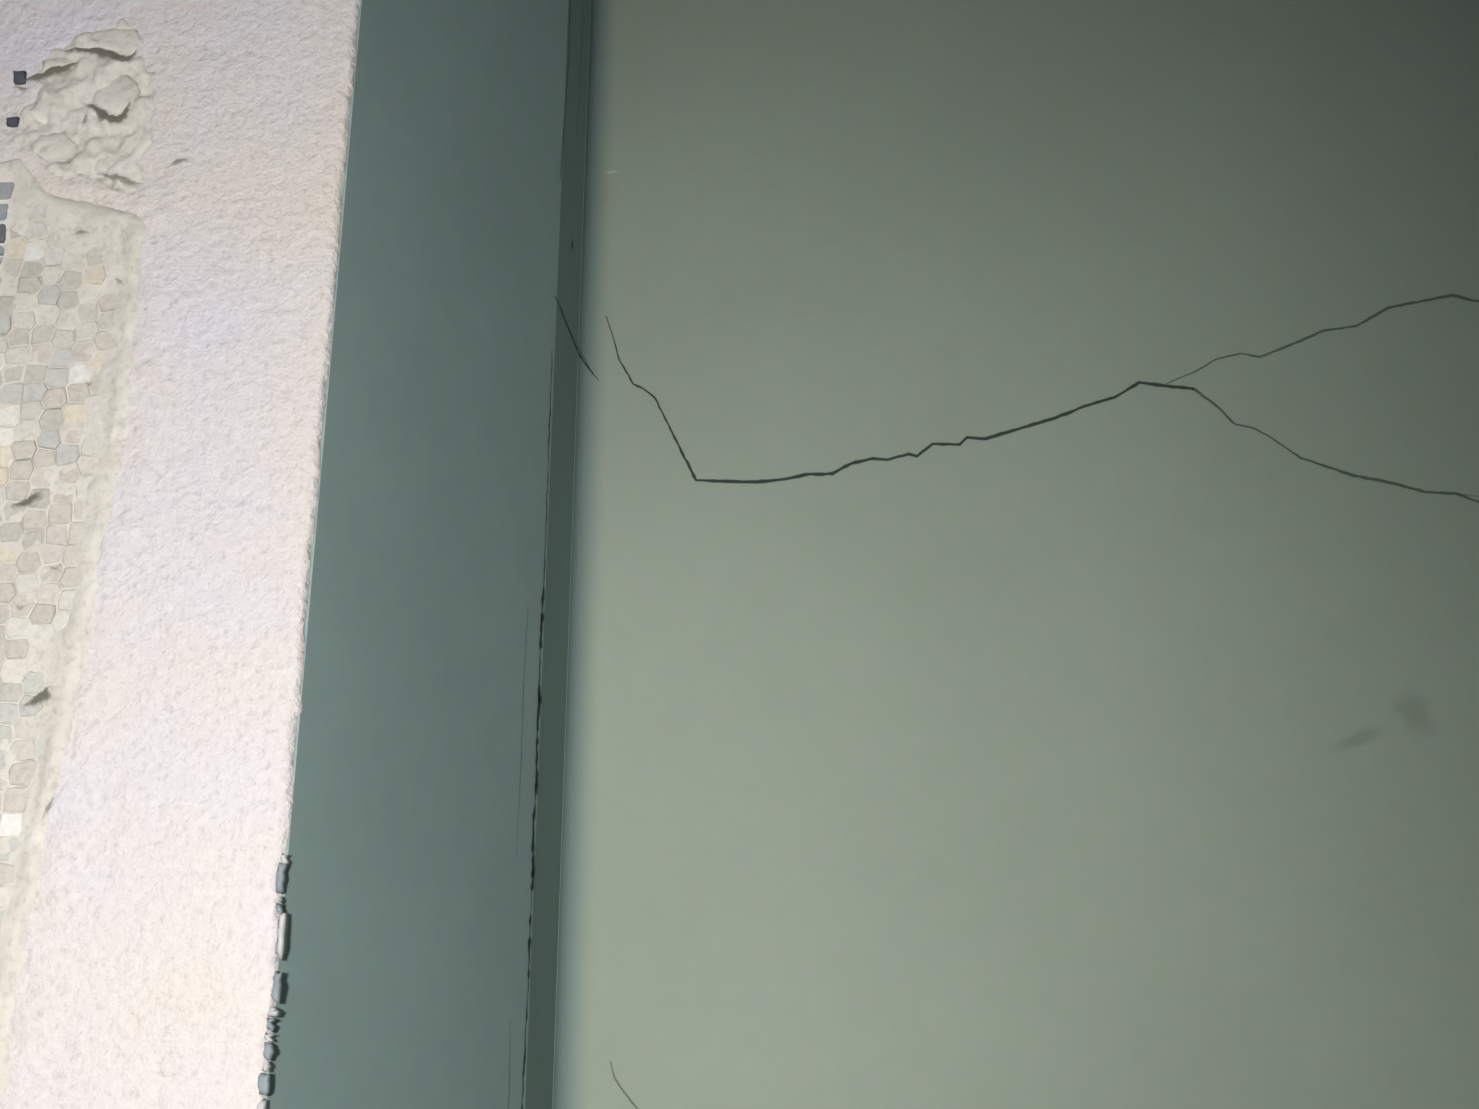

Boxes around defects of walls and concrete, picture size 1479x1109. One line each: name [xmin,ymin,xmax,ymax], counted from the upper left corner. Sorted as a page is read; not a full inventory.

crack [521,294,1479,1109]